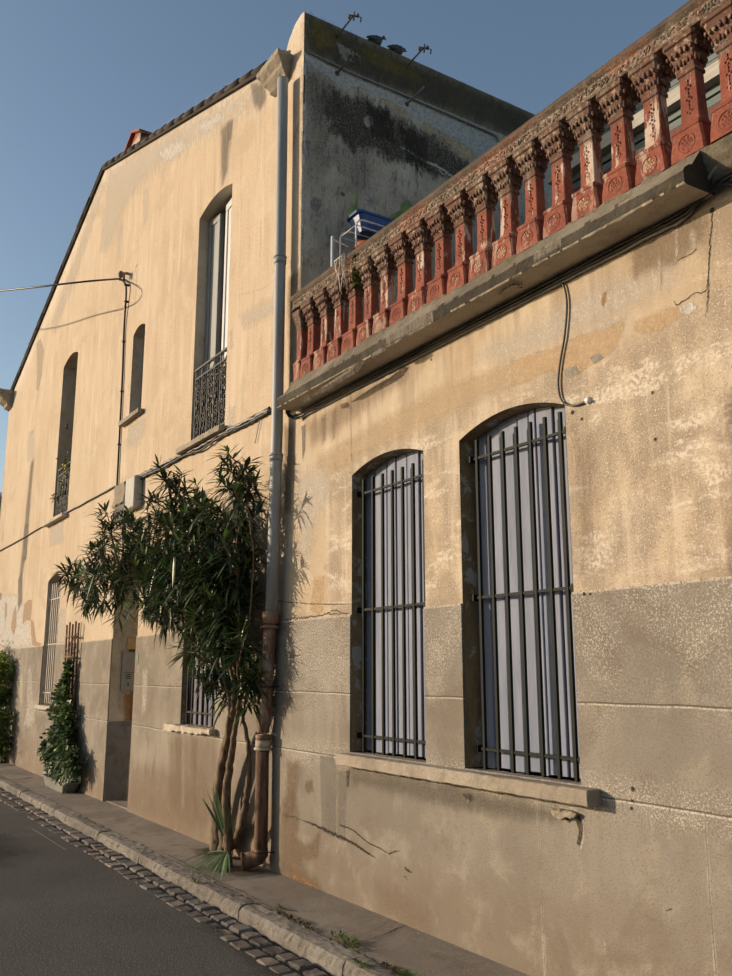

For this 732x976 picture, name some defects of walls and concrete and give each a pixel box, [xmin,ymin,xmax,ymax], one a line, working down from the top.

damp [321,86,469,178]
crack [674,214,713,317]
peeling [511,320,623,384]
peeling [0,594,41,648]
crack [283,814,412,880]
spalling [548,808,584,848]